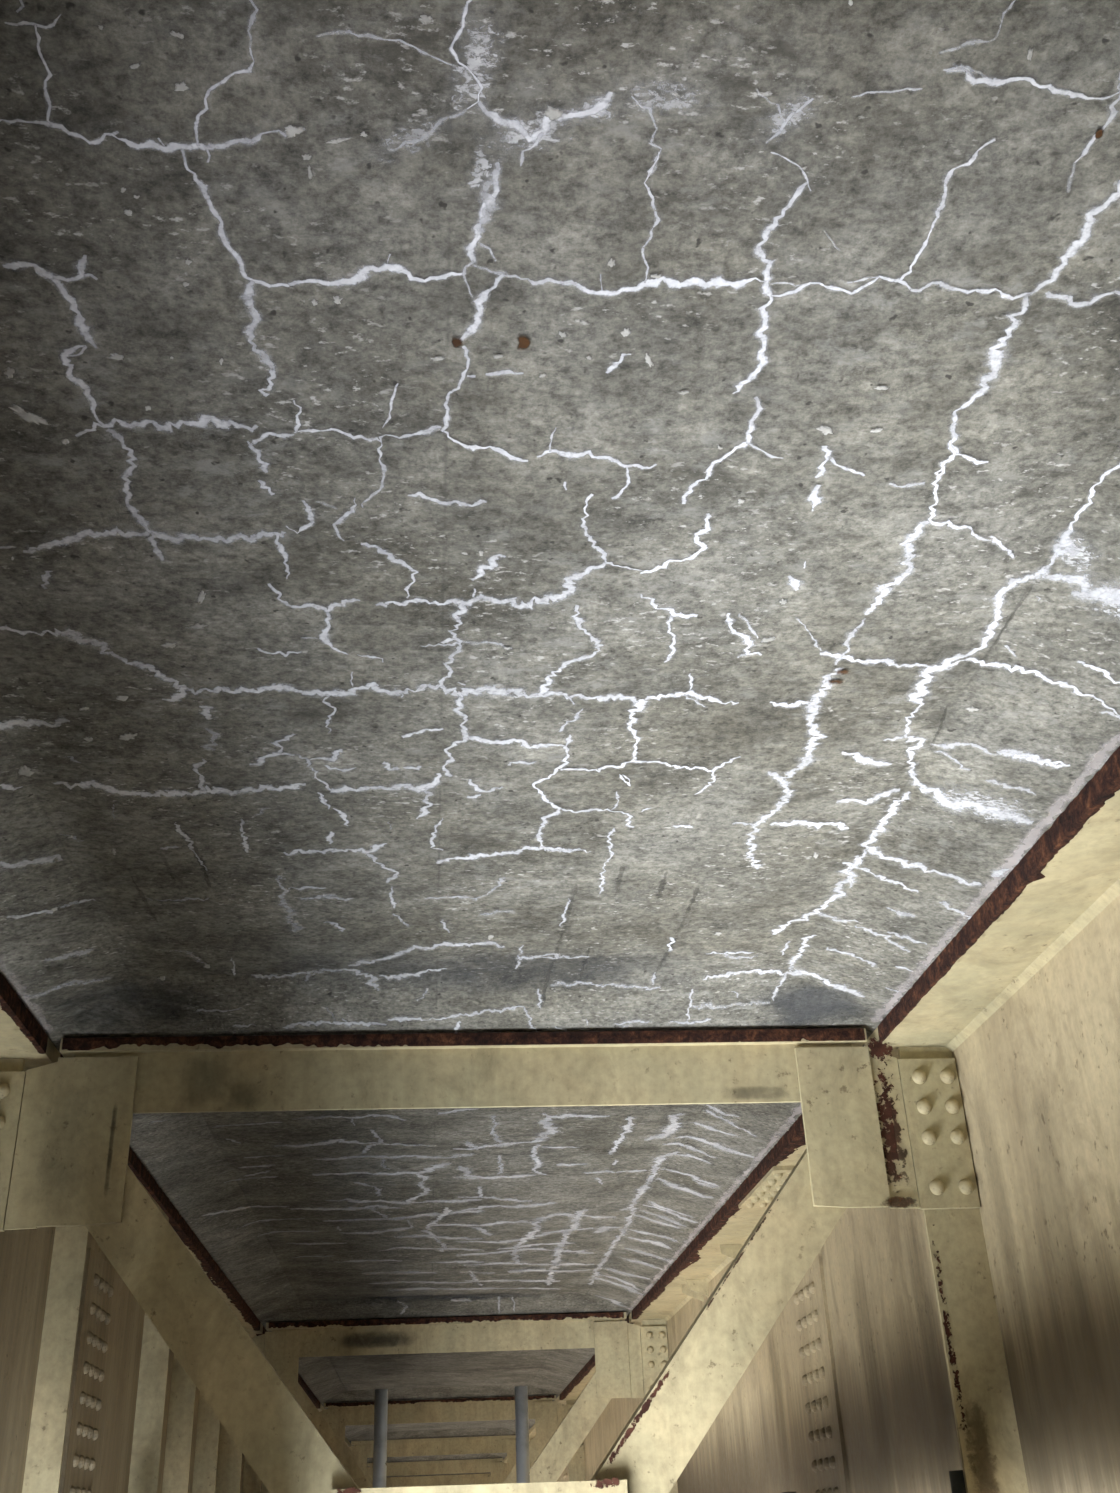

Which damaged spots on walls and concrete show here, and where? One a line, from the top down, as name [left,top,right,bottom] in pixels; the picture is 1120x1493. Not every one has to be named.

water stain [451,25,504,111]
water stain [468,96,611,188]
water stain [631,82,698,110]
corrosion [0,746,1120,1208]
corrosion [128,1114,806,1336]
crack [203,1105,754,1314]